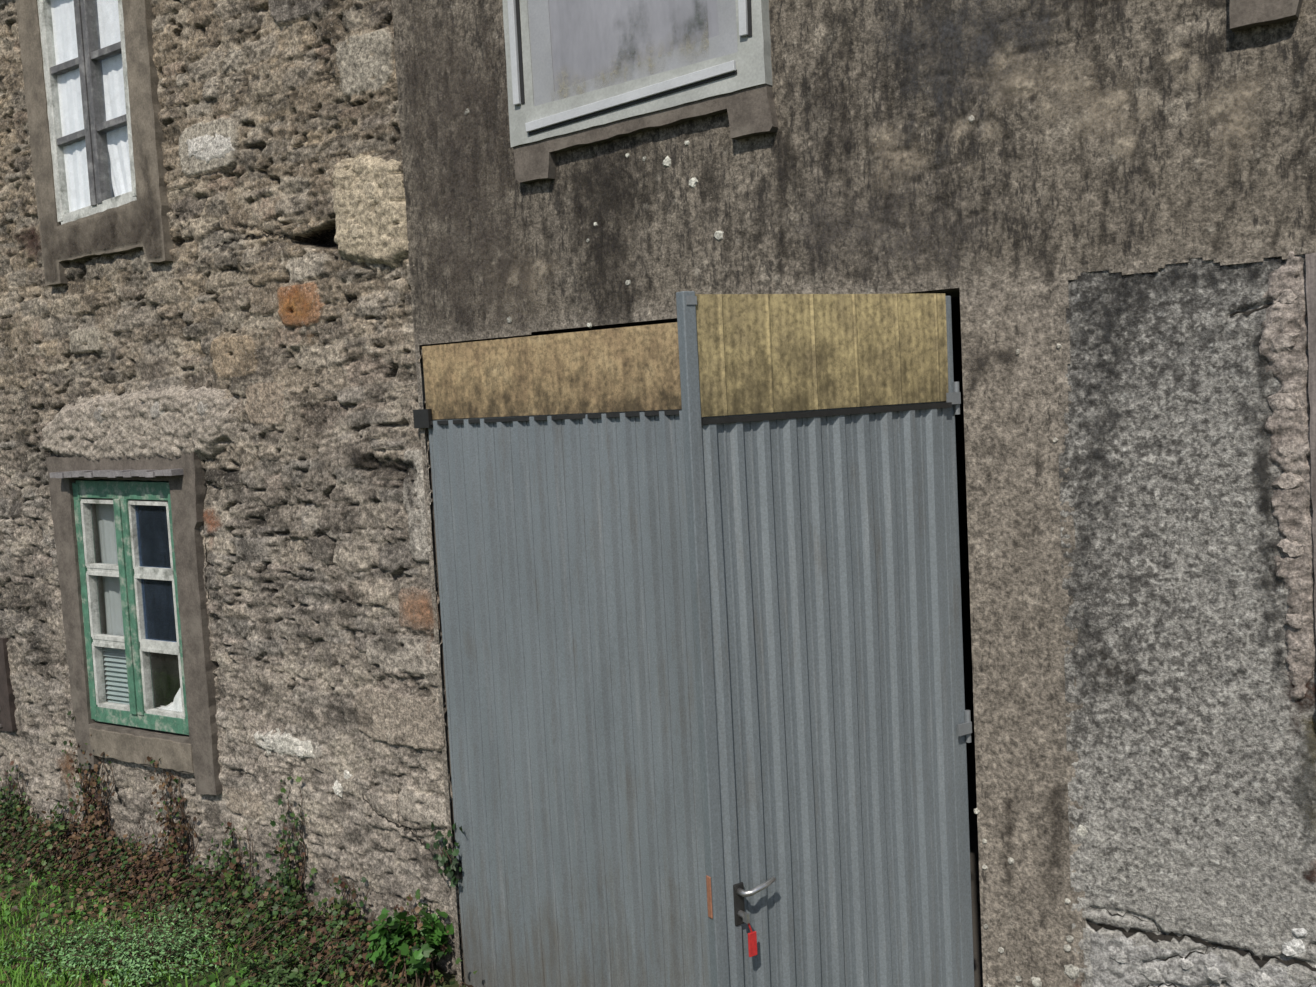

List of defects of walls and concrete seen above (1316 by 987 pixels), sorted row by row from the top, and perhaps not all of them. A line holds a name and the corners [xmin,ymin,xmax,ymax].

water stain [571,156,631,325]
water stain [1085,272,1132,375]
spalling [1258,251,1316,701]
water stain [1081,606,1135,692]
crack [1087,906,1316,987]